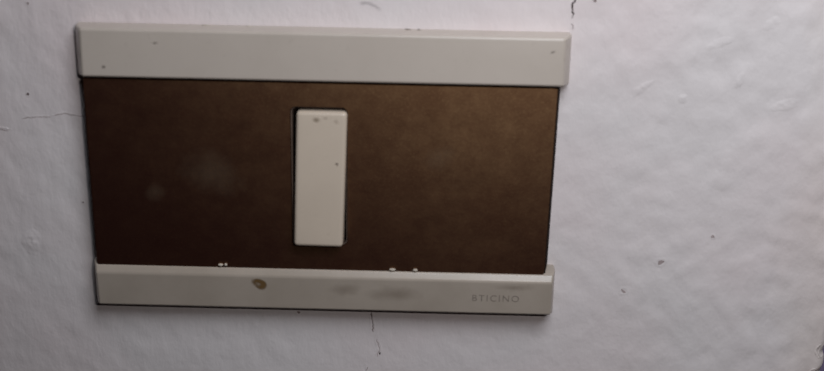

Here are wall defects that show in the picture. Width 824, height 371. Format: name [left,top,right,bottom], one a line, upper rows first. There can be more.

crack [568,0,579,30]